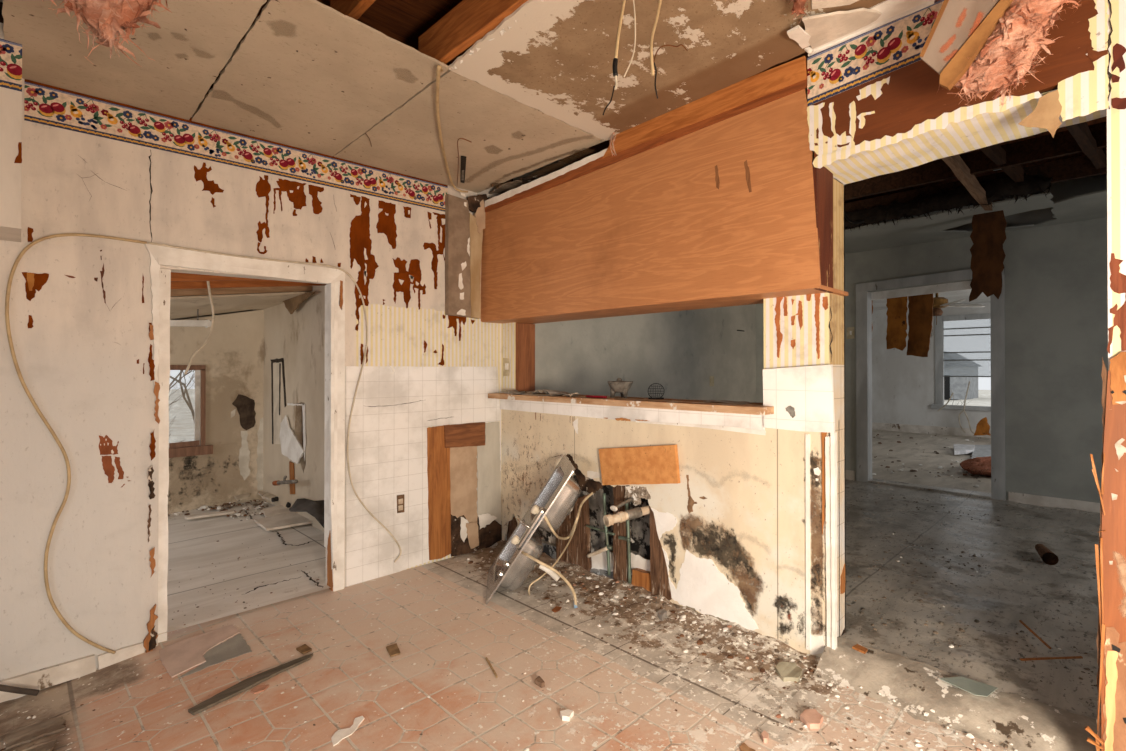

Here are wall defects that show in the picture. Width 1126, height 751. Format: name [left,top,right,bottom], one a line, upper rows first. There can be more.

peeling [22,272,49,301]
peeling [194,162,224,208]
peeling [255,175,324,254]
peeling [338,194,445,331]
peeling [775,293,828,359]
peeling [1107,253,1126,405]
spalling [137,323,160,576]
damp [169,456,228,495]
flaking render [231,394,263,490]
damp [663,475,763,615]
damp [774,452,827,655]